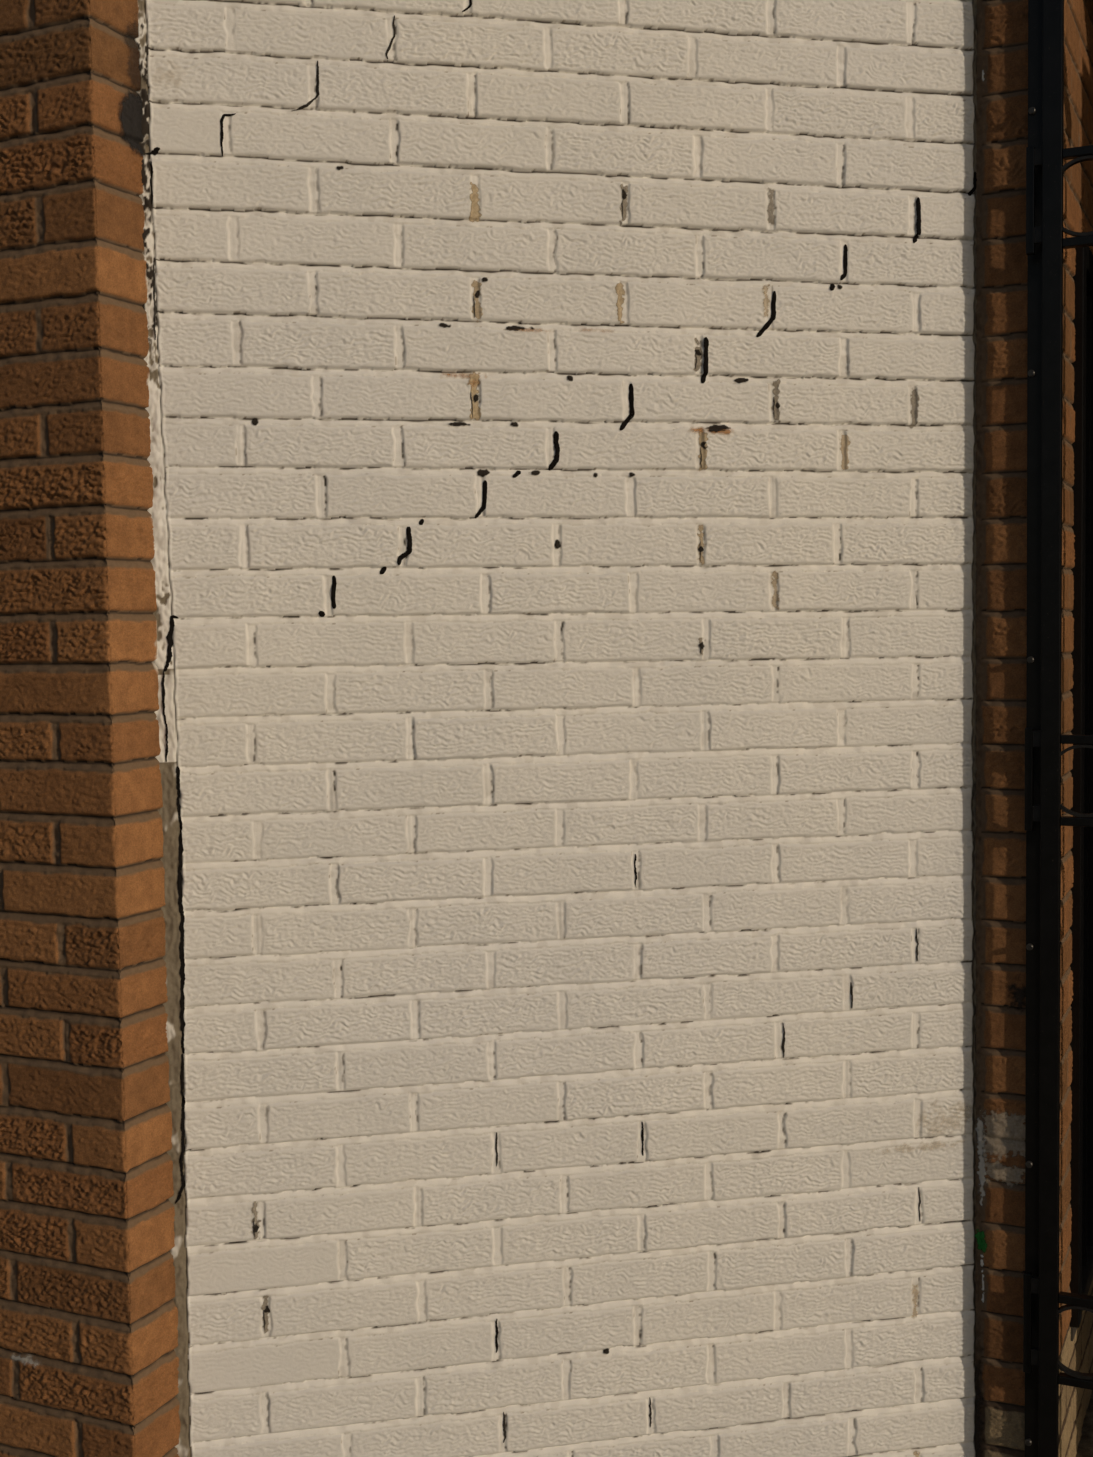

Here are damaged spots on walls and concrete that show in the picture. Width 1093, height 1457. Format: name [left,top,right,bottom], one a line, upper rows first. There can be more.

crack [385,15,395,61]
crack [292,61,319,111]
crack [220,113,236,157]
crack [913,197,921,243]
crack [830,244,848,291]
crack [756,291,776,337]
crack [701,337,709,383]
crack [620,384,635,431]
crack [474,431,560,519]
crack [380,519,424,574]
crack [318,576,337,617]
crack [161,615,186,1204]